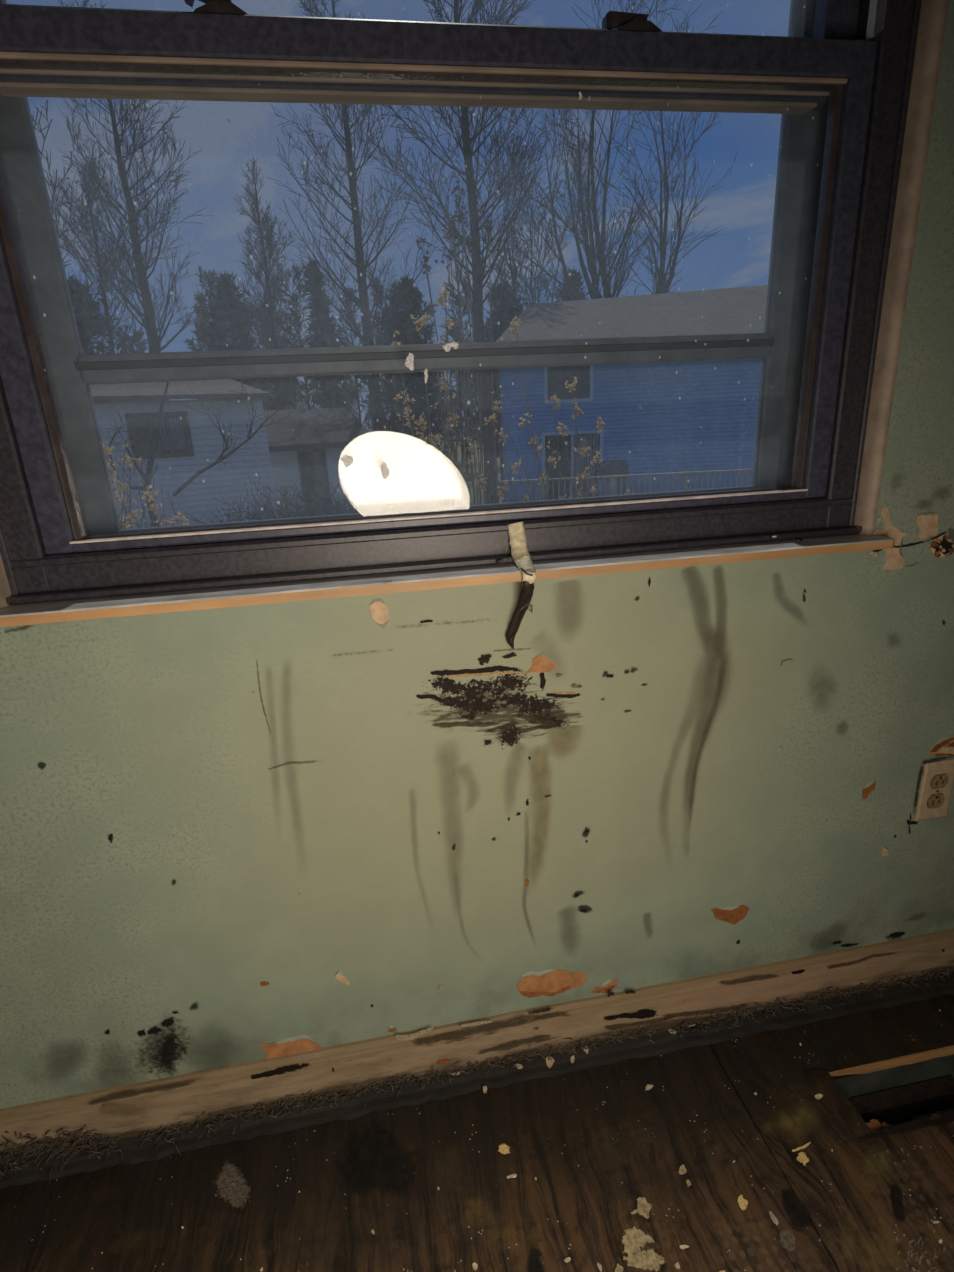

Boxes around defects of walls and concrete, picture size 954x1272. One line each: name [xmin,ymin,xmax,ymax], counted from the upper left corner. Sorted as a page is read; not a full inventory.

peeling [869,506,938,572]
peeling [929,735,954,759]
peeling [711,905,749,925]
damp [827,932,906,969]
peeling [517,968,618,998]
damp [720,975,777,985]
damp [604,1004,746,1030]
damp [414,1012,566,1054]
damp [90,1004,198,1105]
damp [251,1063,312,1079]